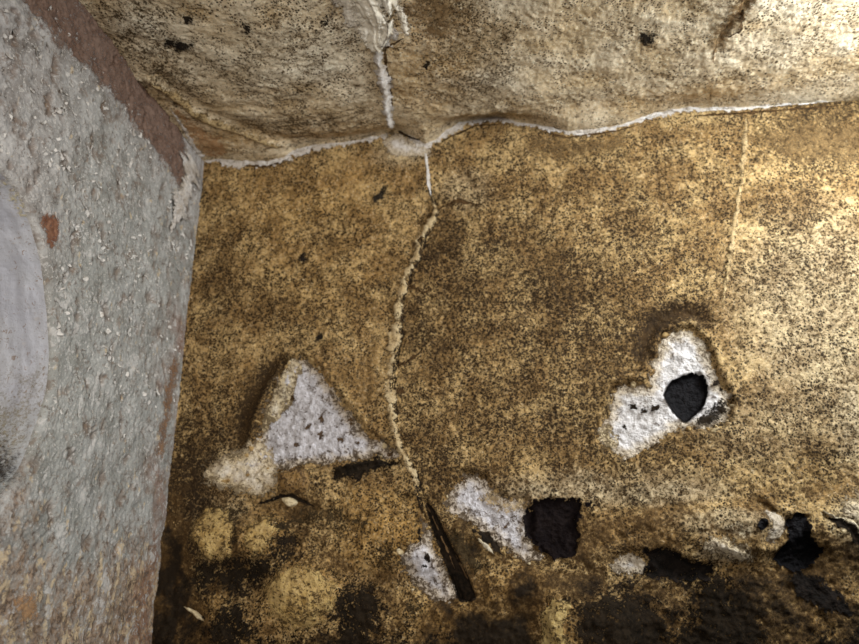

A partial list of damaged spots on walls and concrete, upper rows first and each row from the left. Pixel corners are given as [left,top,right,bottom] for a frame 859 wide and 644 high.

crack [709,0,756,64]
crack [205,23,843,602]
water stain [0,396,28,483]
spalling [200,355,399,507]
spalling [595,329,734,462]
water stain [152,493,524,644]
spalling [393,514,457,604]
spalling [442,469,543,565]
water stain [523,497,596,561]
water stain [550,512,859,644]
spalling [764,502,786,543]
crack [823,510,859,550]